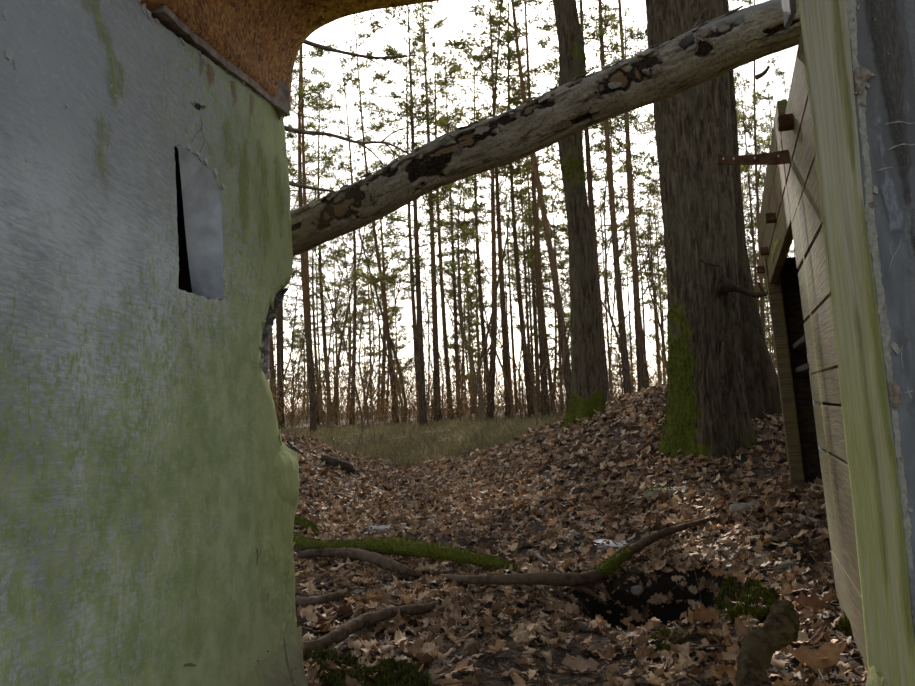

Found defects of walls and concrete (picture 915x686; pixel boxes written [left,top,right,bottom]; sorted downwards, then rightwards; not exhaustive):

peeling [846,0,915,626]
damp [866,0,911,230]